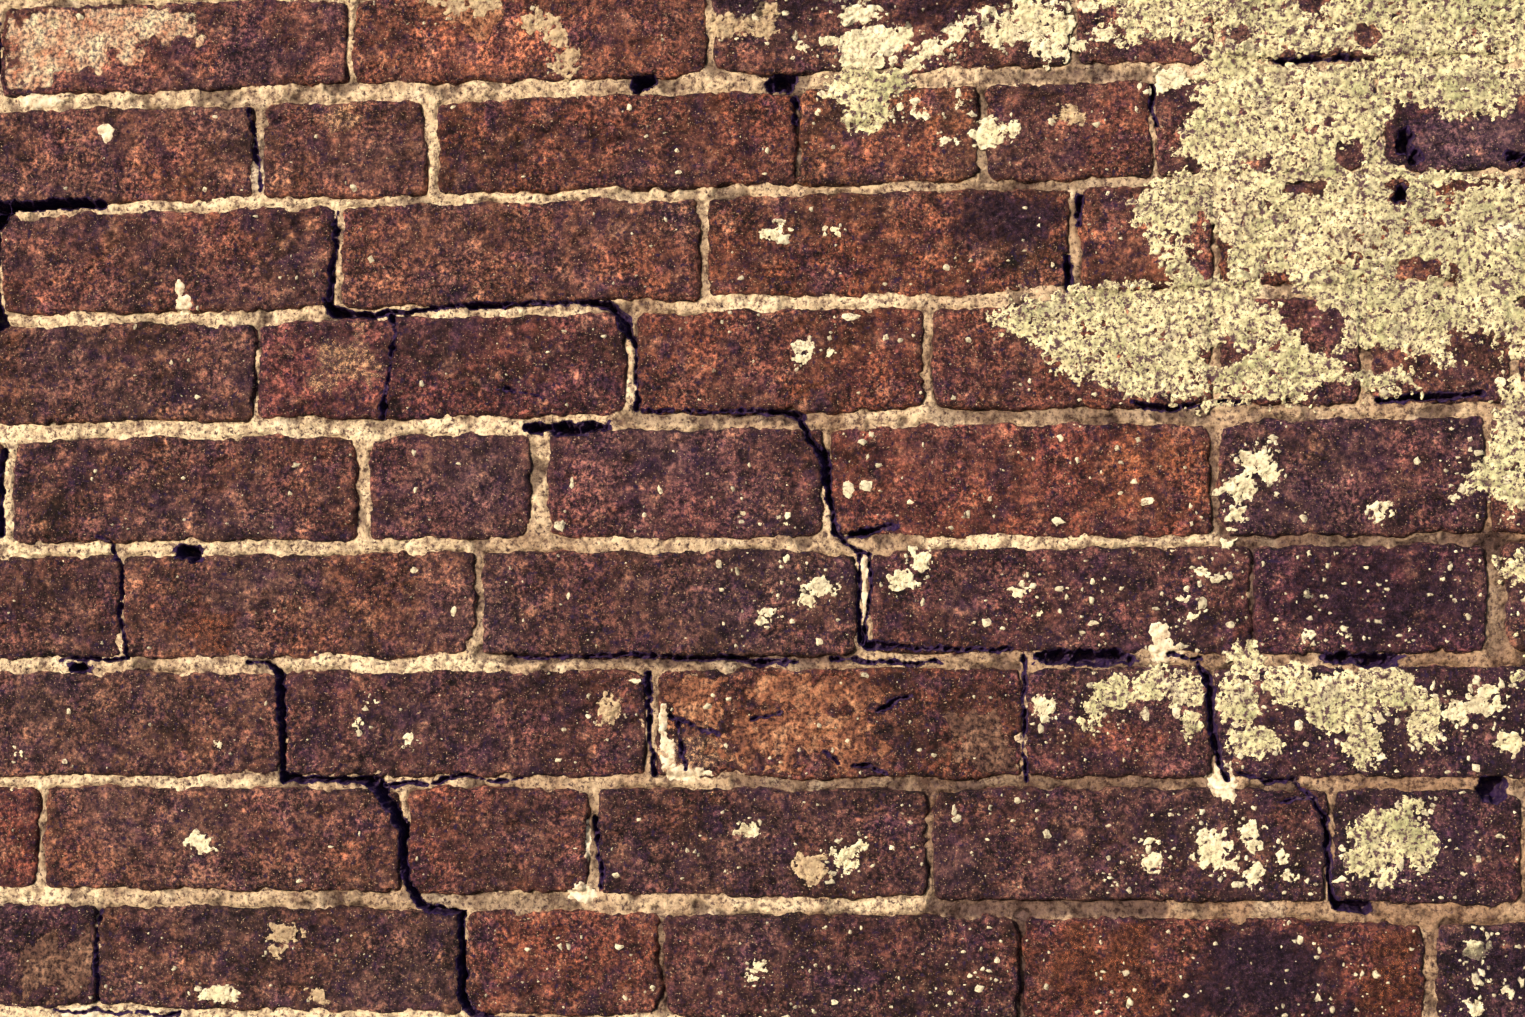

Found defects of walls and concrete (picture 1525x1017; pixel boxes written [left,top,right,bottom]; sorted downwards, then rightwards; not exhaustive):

crack [0,196,108,332]
crack [321,211,1029,783]
crack [246,660,532,1017]
crack [592,815,606,889]